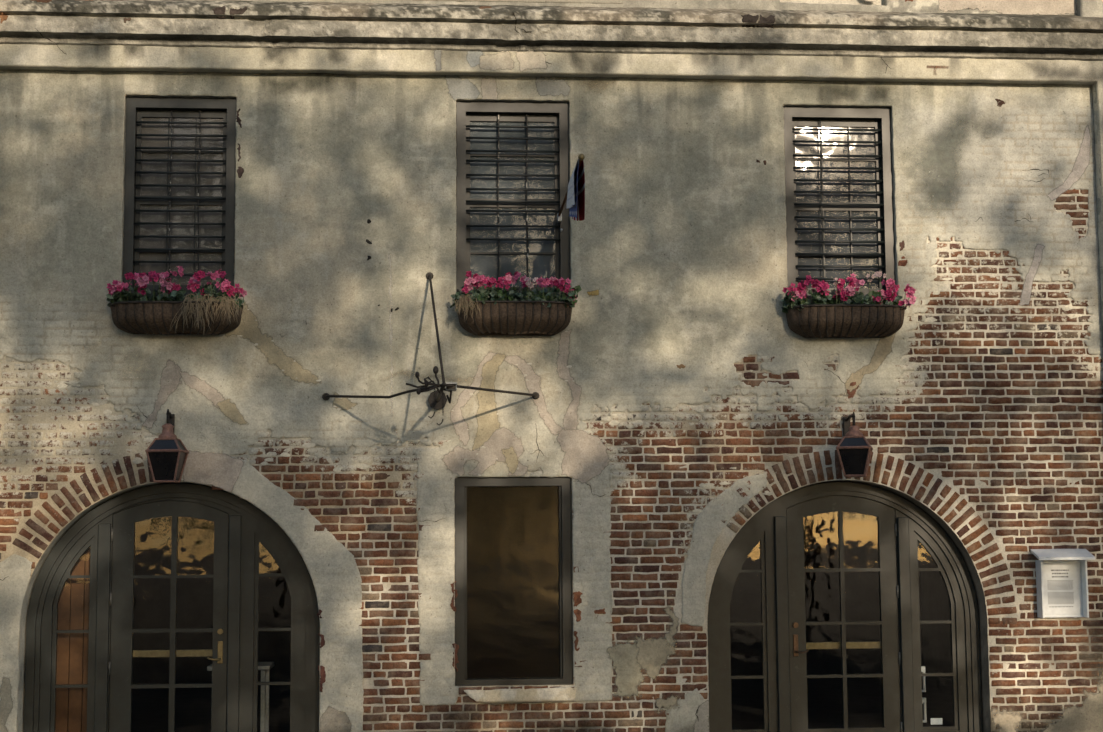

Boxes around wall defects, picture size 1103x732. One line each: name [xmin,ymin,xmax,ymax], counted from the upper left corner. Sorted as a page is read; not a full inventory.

damp [916,121,965,212]
flaking render [1054,189,1089,239]
flaking render [906,236,1103,368]
flaking render [734,356,800,387]
peeling [0,356,160,483]
flaking render [601,408,649,429]
flaking render [240,438,324,465]
flaking render [699,481,731,491]
flaking render [450,581,458,612]
flaking render [572,591,583,651]
flaking render [318,665,326,692]